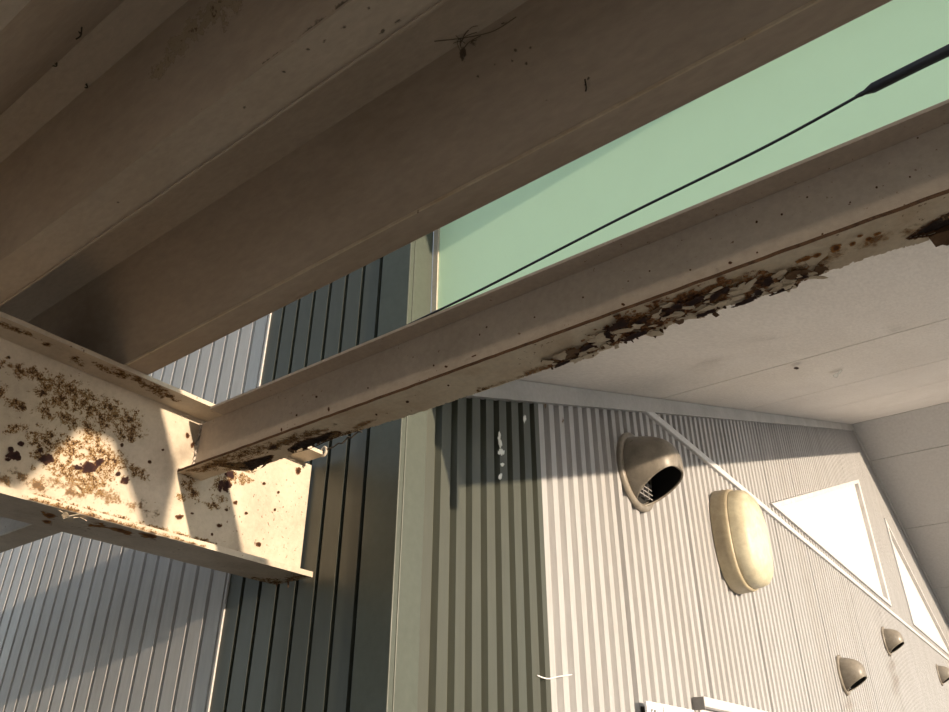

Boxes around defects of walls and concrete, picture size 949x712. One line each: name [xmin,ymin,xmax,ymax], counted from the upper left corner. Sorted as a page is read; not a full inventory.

corrosion [0,322,51,347]
corrosion [477,232,888,393]
corrosion [0,356,377,548]